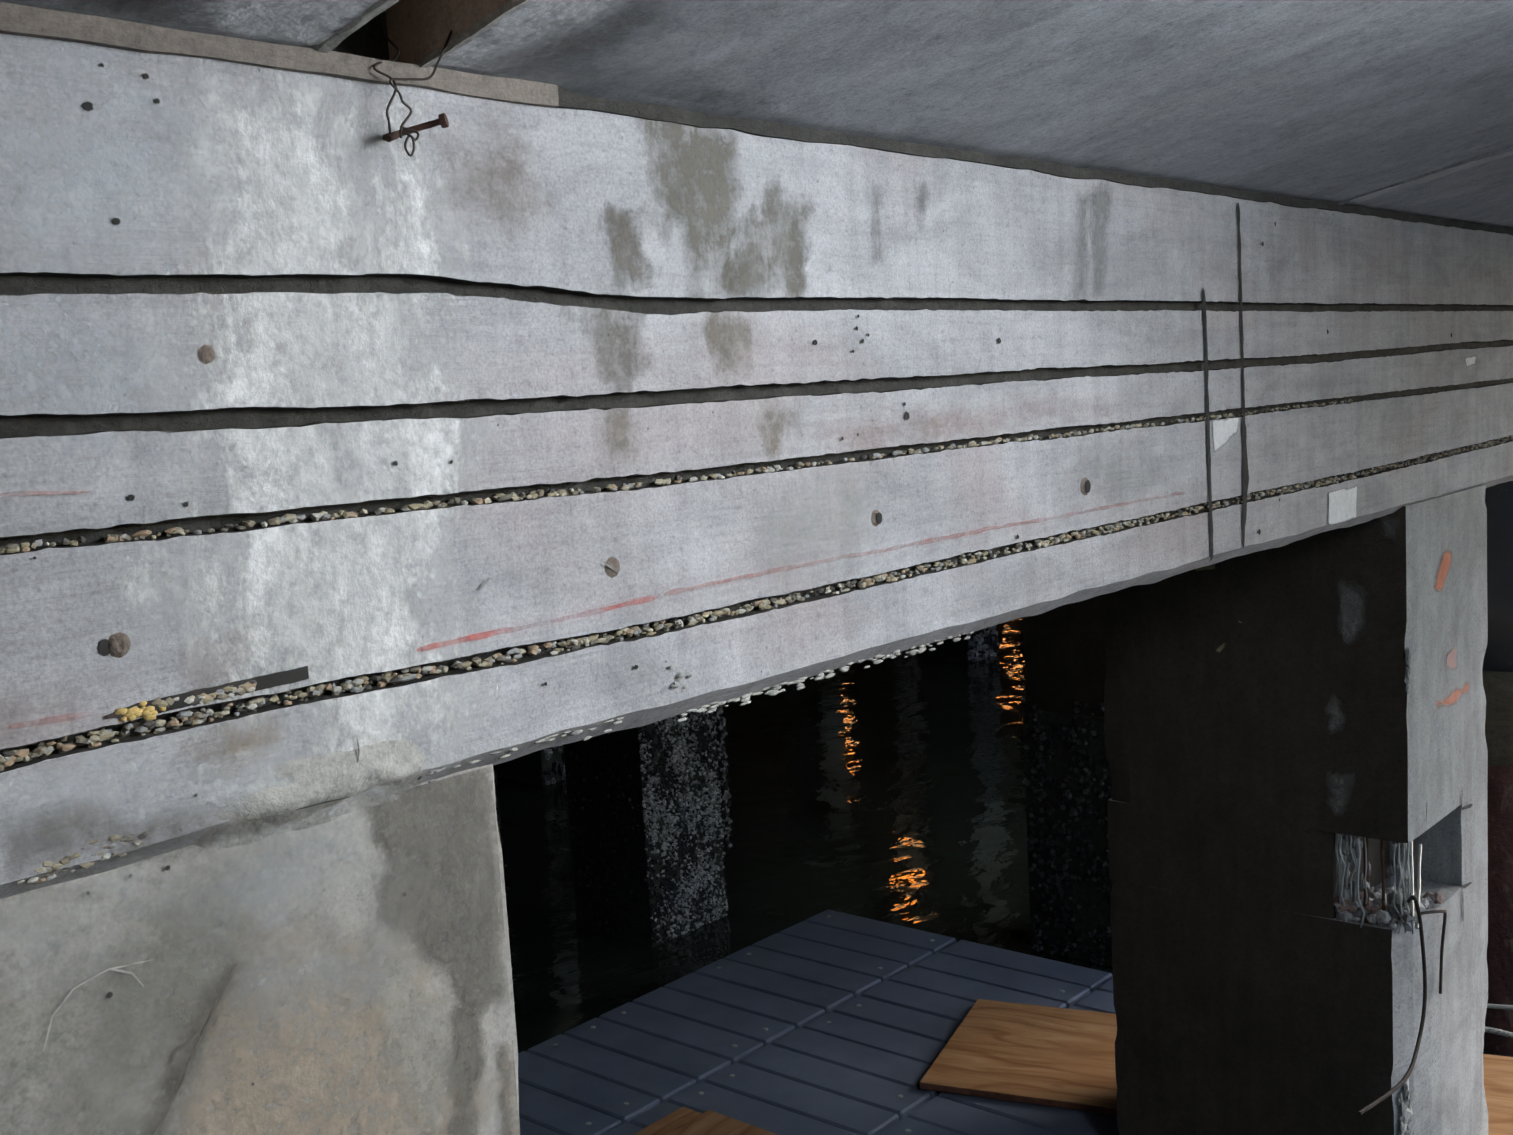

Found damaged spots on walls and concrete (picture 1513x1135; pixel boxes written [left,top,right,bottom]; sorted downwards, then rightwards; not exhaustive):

damp [612,216,647,280]
damp [645,121,811,297]
damp [599,309,637,379]
spalling [0,399,1353,559]
spalling [0,436,1513,771]
spalling [1334,833,1444,935]